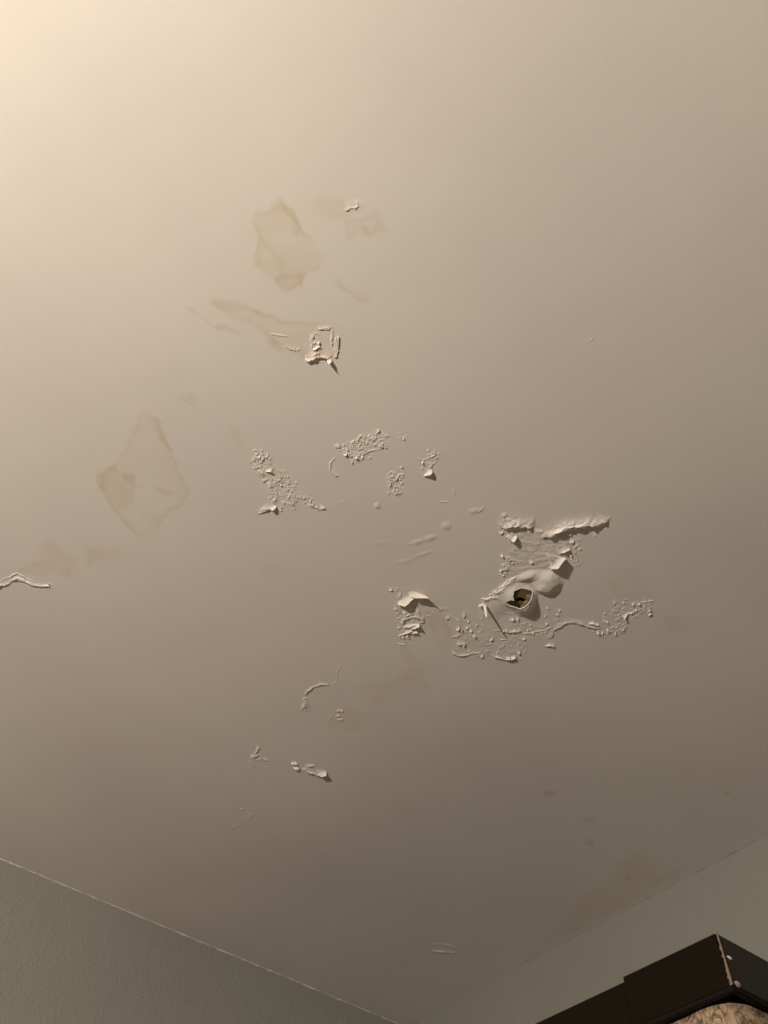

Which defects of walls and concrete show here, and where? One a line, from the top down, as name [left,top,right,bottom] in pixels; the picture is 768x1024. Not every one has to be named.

water stain [249,192,393,305]
water stain [185,296,345,361]
peeling [269,324,339,365]
water stain [92,409,192,545]
peeling [249,448,325,515]
peeling [328,429,408,479]
peeling [385,465,406,497]
peeling [415,445,441,476]
peeling [493,510,612,577]
peeling [387,587,655,661]
peeling [291,761,328,778]